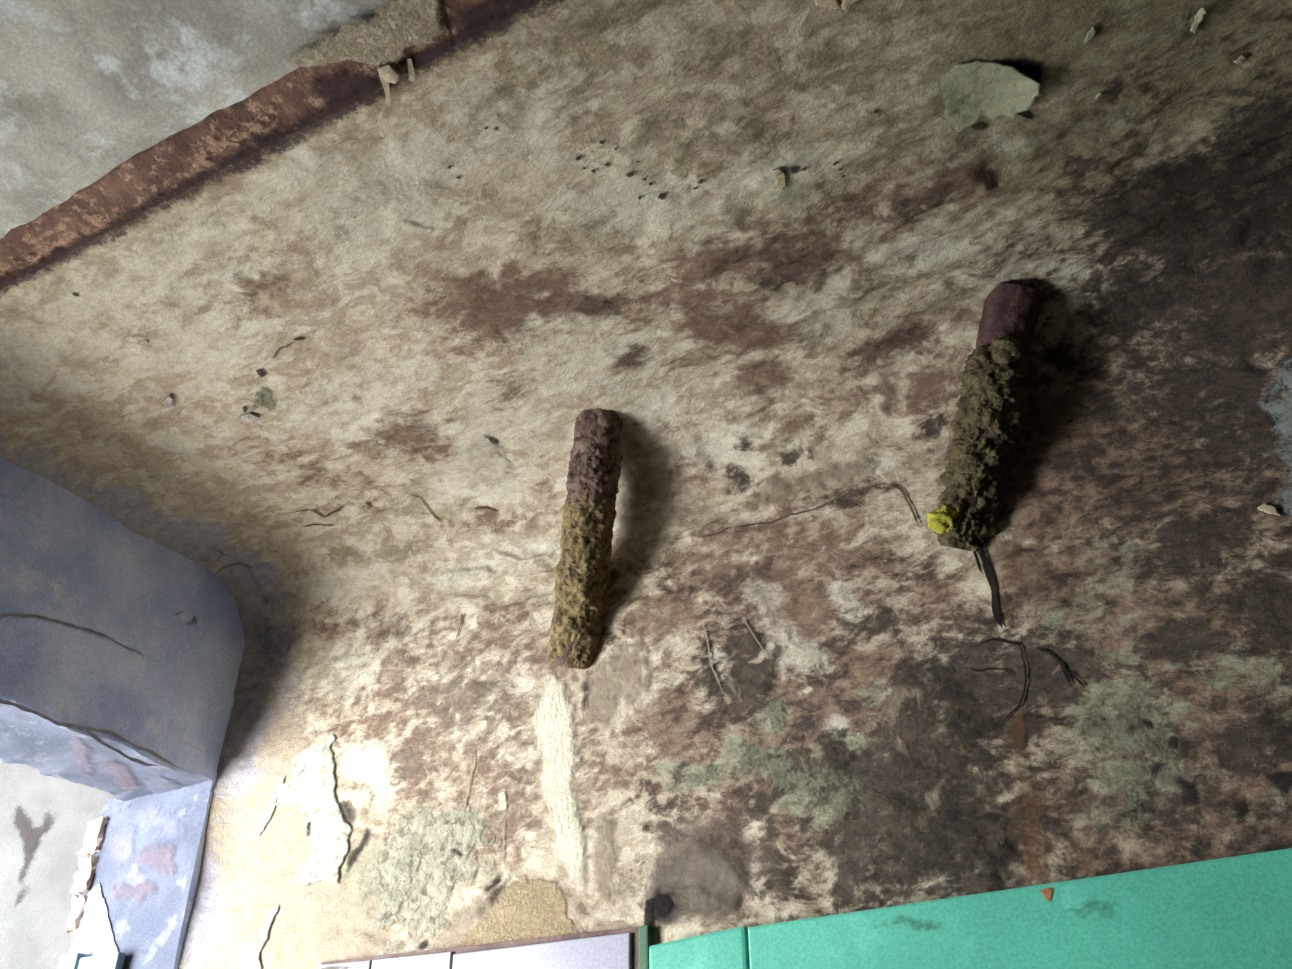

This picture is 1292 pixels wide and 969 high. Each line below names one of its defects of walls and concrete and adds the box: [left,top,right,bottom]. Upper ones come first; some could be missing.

peeling [939,59,1042,133]
corrosion [0,0,566,298]
damp [617,346,645,368]
damp [685,306,793,395]
crack [0,613,143,655]
damp [707,558,828,696]
crack [0,698,182,769]
flaking render [72,738,136,789]
peeling [256,734,369,886]
damp [857,655,1021,894]
damp [1267,772,1292,810]
peeling [240,904,278,969]